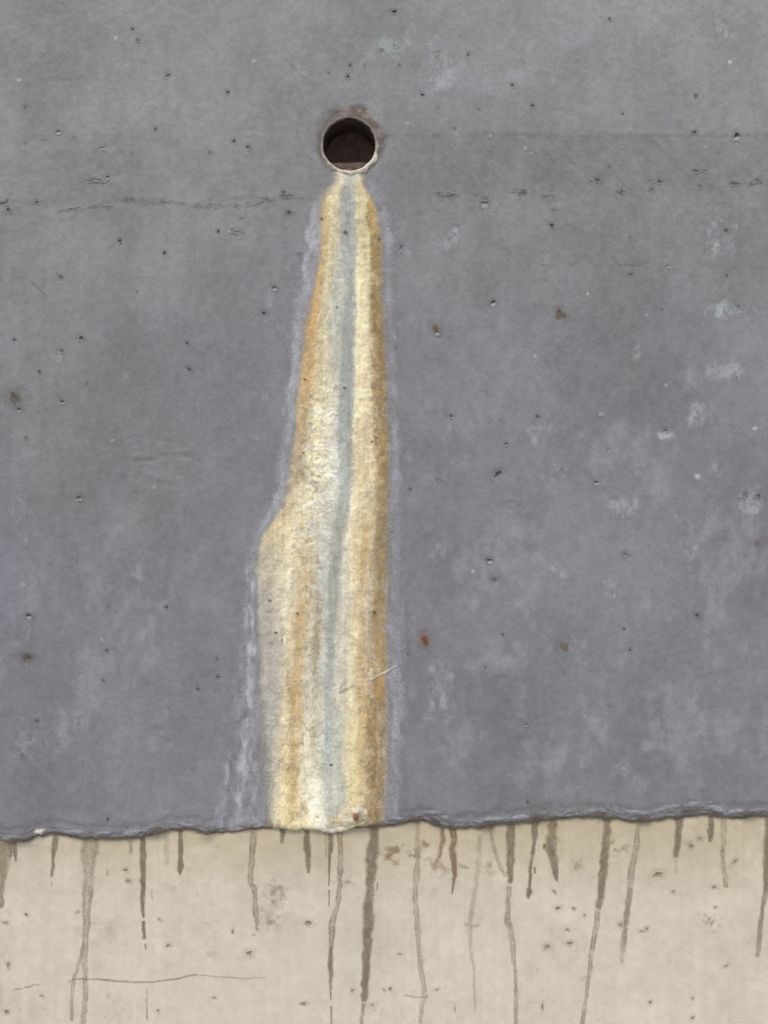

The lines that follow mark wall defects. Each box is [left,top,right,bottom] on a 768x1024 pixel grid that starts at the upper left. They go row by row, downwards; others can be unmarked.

water stain [0,840,17,908]
water stain [49,834,60,886]
water stain [69,838,99,1024]
water stain [128,837,147,949]
water stain [164,830,185,875]
water stain [404,822,519,1024]
water stain [526,818,560,899]
water stain [580,819,613,1024]
water stain [620,822,641,962]
water stain [673,817,684,874]
water stain [755,816,768,958]
crack [68,974,265,1019]